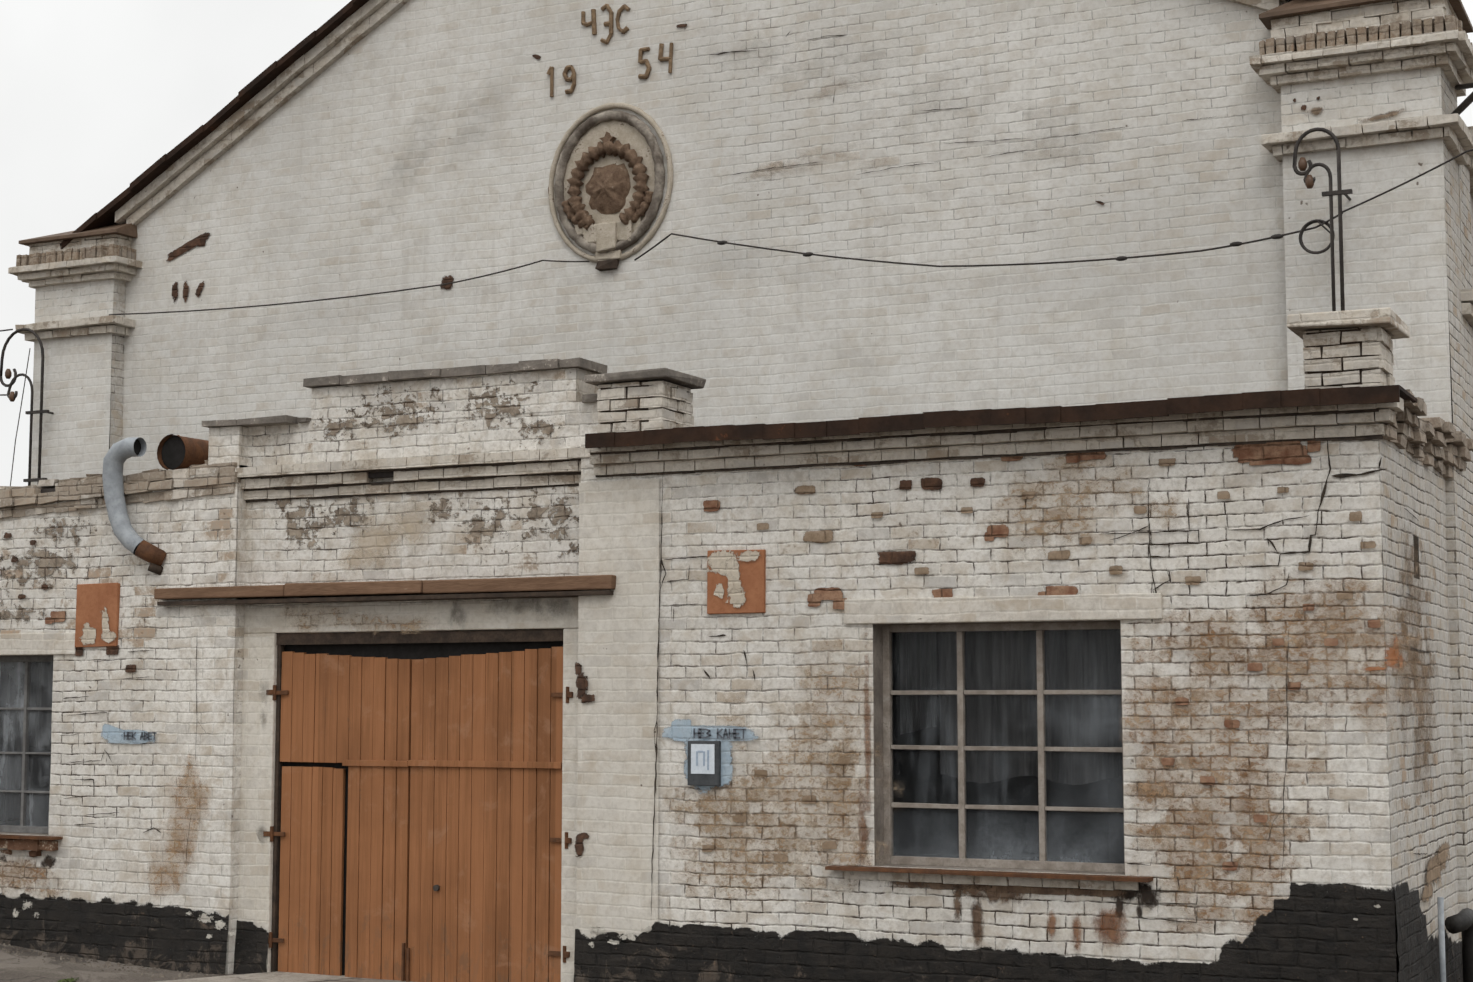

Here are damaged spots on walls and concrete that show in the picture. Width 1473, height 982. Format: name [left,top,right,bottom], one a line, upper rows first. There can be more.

peeling [312,379,562,448]
peeling [0,512,95,624]
peeling [274,496,375,554]
peeling [420,487,579,558]
crack [1105,426,1386,596]
spalling [74,607,136,673]
water stain [892,543,1436,945]
crack [1267,631,1289,882]